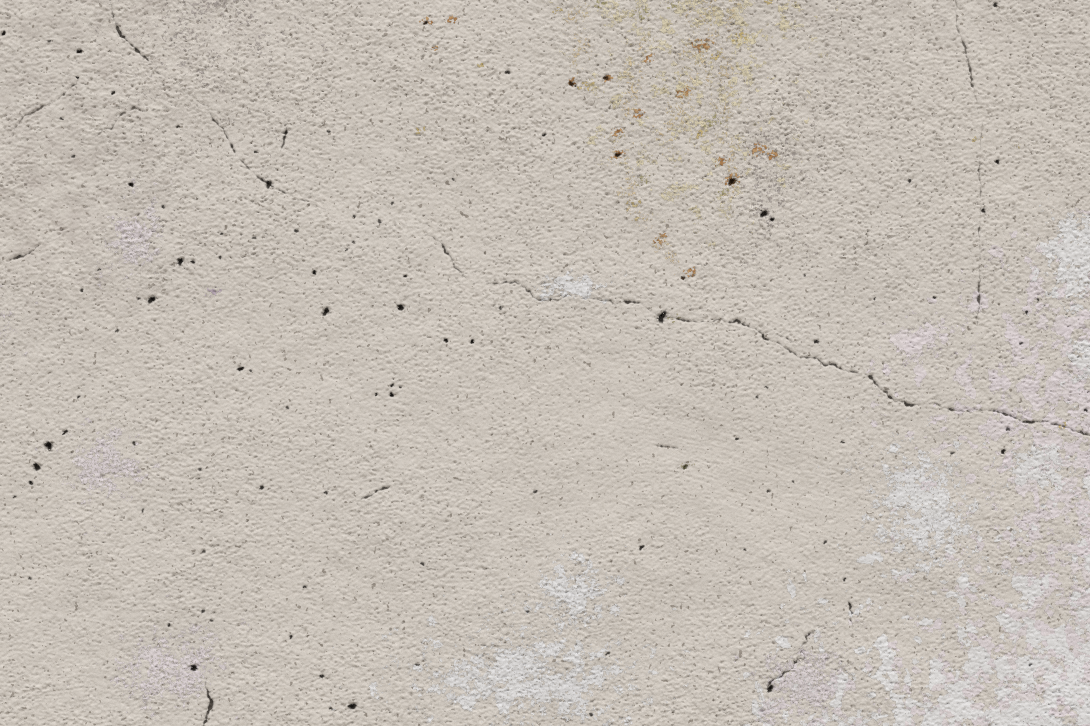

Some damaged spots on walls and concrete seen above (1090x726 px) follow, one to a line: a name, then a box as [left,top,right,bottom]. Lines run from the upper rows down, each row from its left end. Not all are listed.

crack [113,15,148,60]
crack [213,119,285,193]
crack [661,316,954,411]
crack [993,410,1089,435]